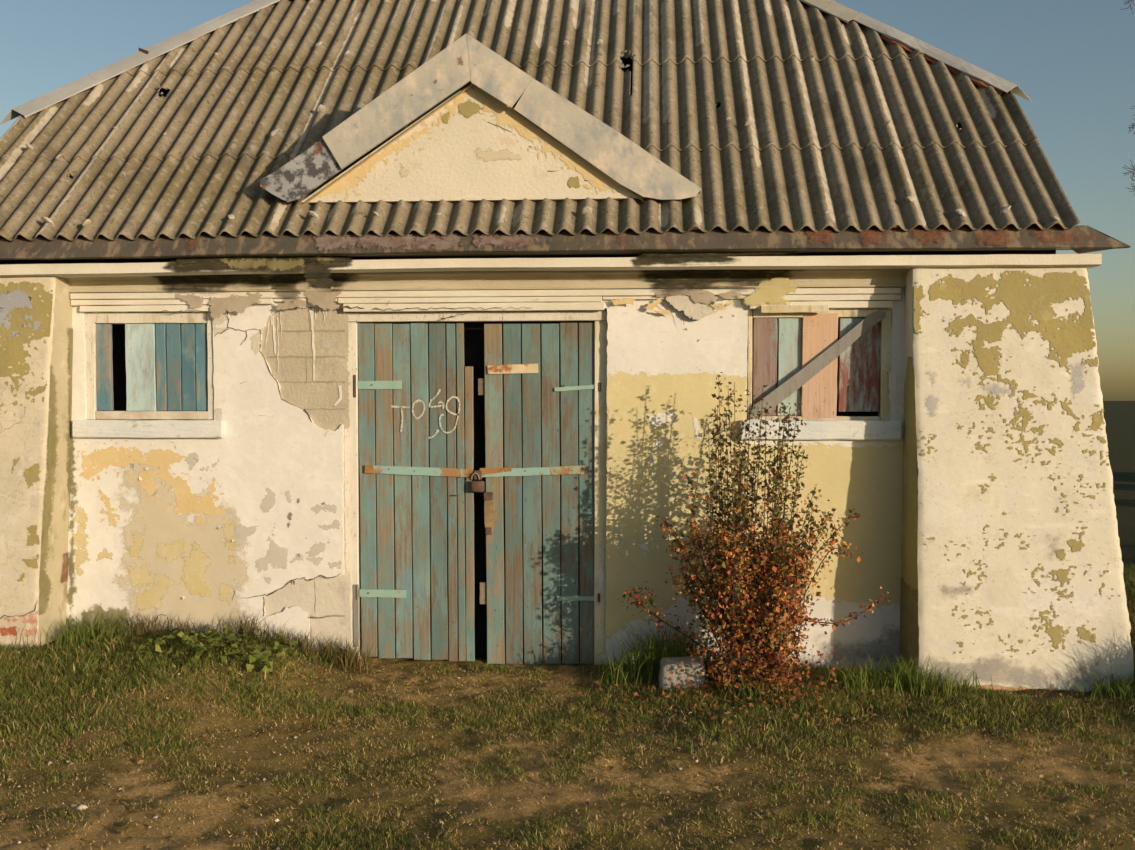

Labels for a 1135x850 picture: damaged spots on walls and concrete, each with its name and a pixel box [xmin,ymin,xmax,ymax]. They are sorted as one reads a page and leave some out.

peeling [307,83,622,201]
rust [979,231,1010,245]
peeling [0,281,53,416]
crack [164,309,328,437]
flaking render [250,287,350,431]
flaking render [611,288,744,330]
flaking render [0,611,38,648]
peeling [11,457,41,489]
peeling [72,439,257,576]
crack [232,574,340,616]
flaking render [255,488,351,651]
peeling [746,270,1121,660]